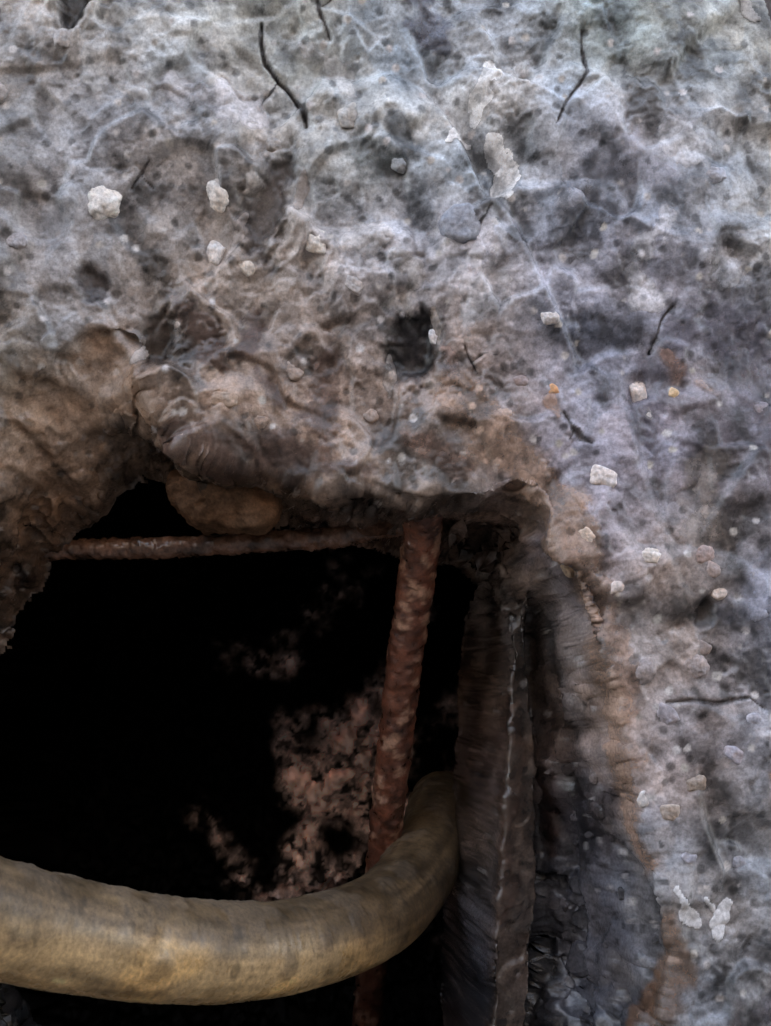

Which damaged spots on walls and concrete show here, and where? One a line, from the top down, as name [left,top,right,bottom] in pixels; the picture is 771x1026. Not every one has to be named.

spalling [62,0,89,29]
crack [259,25,307,129]
crack [556,30,589,123]
spalling [226,163,310,257]
spalling [130,311,184,366]
rust [174,299,288,409]
spalling [383,308,442,399]
rust [157,349,376,490]
rust [396,345,656,870]
rust [44,514,443,873]
peeling [673,885,733,942]
rust [626,913,697,1026]